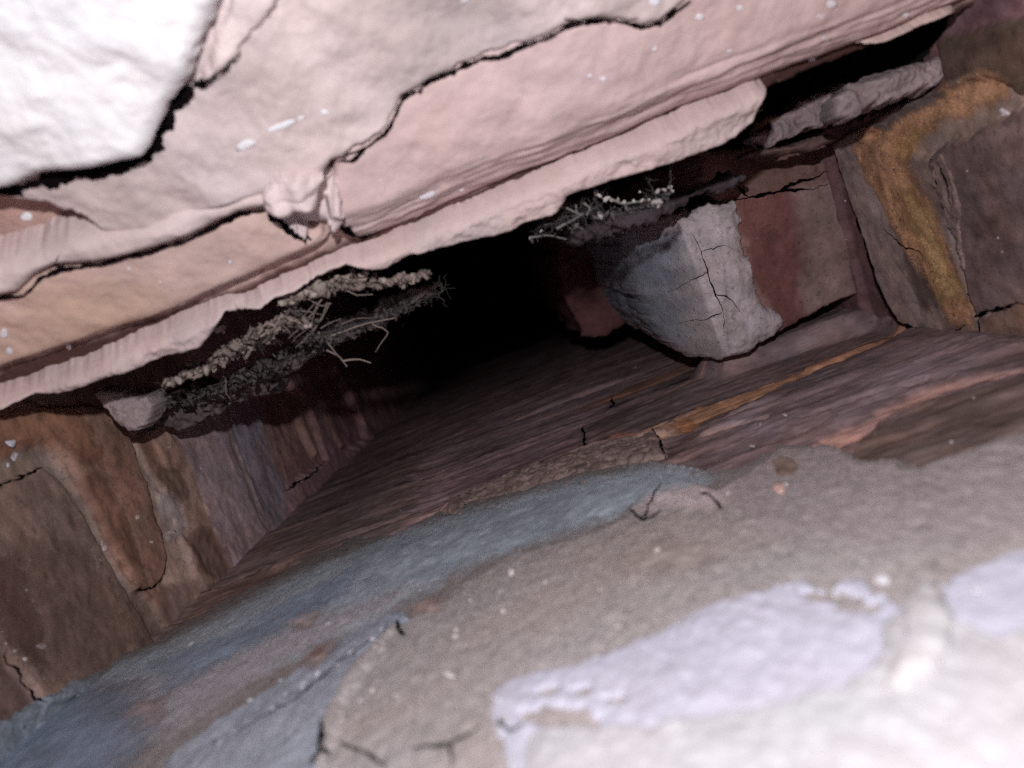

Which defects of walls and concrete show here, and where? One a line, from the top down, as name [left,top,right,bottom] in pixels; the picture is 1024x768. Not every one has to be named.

flaking render [0,0,277,187]
crack [323,0,691,176]
crack [728,171,827,201]
crack [671,233,746,333]
crack [3,648,48,703]